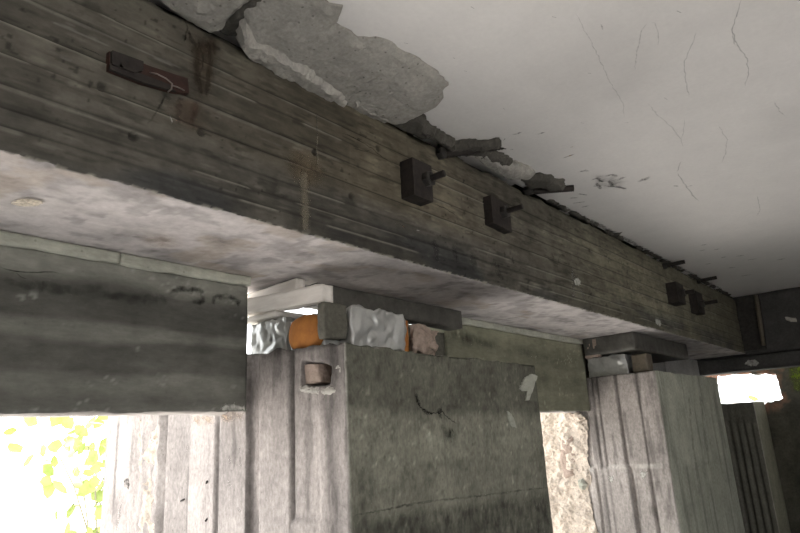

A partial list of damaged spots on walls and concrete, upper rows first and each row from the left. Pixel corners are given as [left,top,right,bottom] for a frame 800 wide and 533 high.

spalling [160,0,599,227]